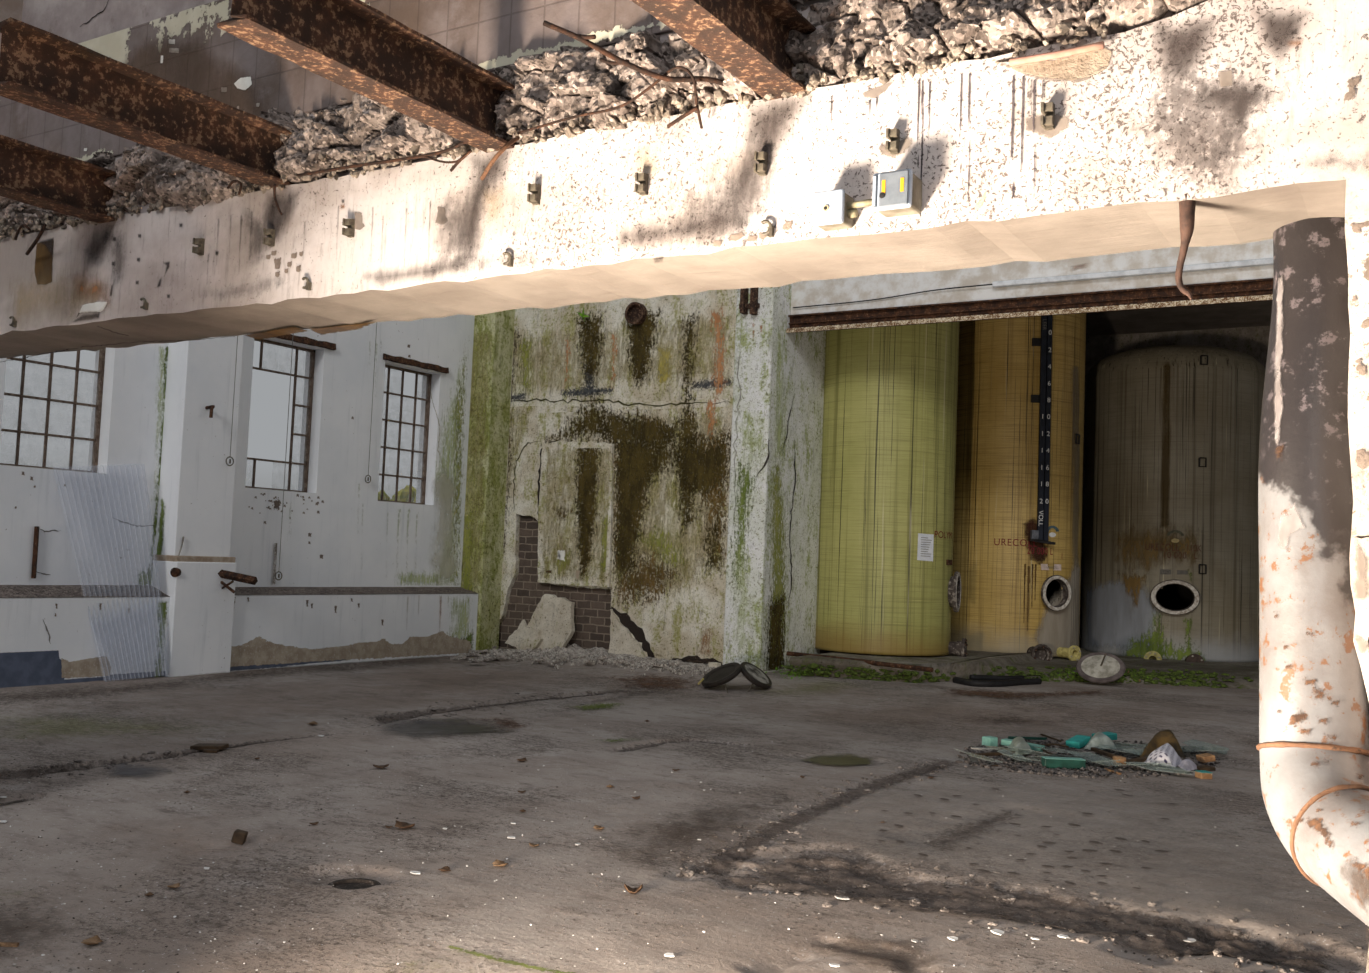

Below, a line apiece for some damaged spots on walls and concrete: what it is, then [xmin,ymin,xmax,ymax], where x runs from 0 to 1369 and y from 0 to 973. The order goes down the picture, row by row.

spalling [0,0,1208,255]
peeling [266,251,303,277]
leakage [511,335,536,402]
leakage [560,362,617,399]
leakage [689,377,733,391]
peeling [61,656,111,678]
peeling [230,631,472,667]
corrosion [1277,679,1339,740]
corrosion [1293,809,1334,847]
corrosion [1349,858,1369,905]